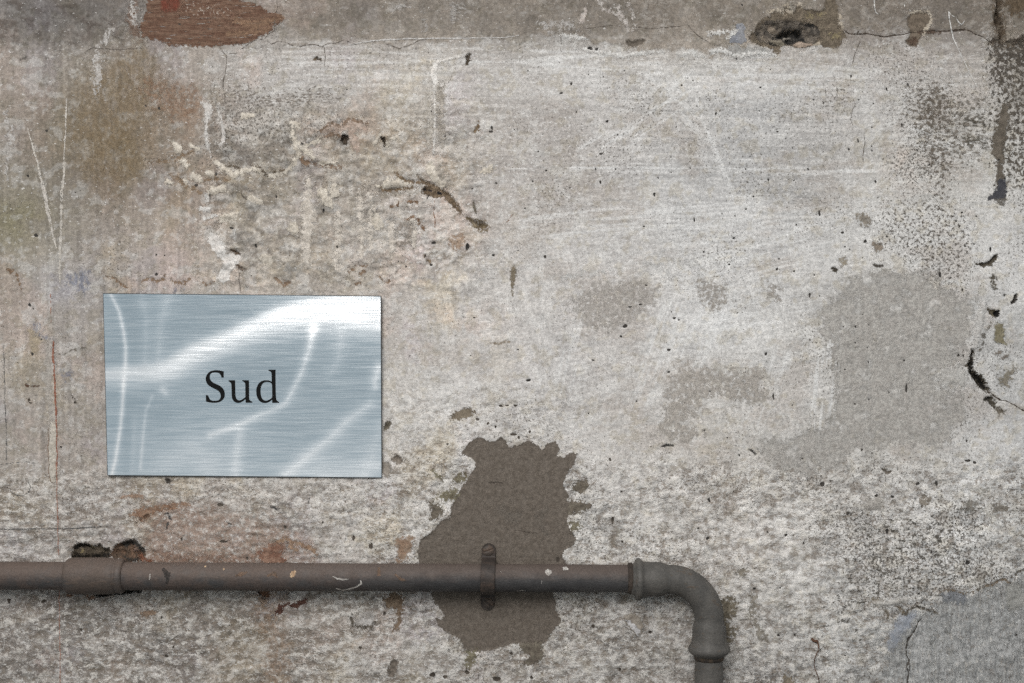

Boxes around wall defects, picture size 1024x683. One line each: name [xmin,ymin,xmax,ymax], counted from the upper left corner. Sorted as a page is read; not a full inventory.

spalling [536,0,847,71]
damp [875,35,1024,286]
crack [964,298,1024,416]
spalling [71,538,152,562]